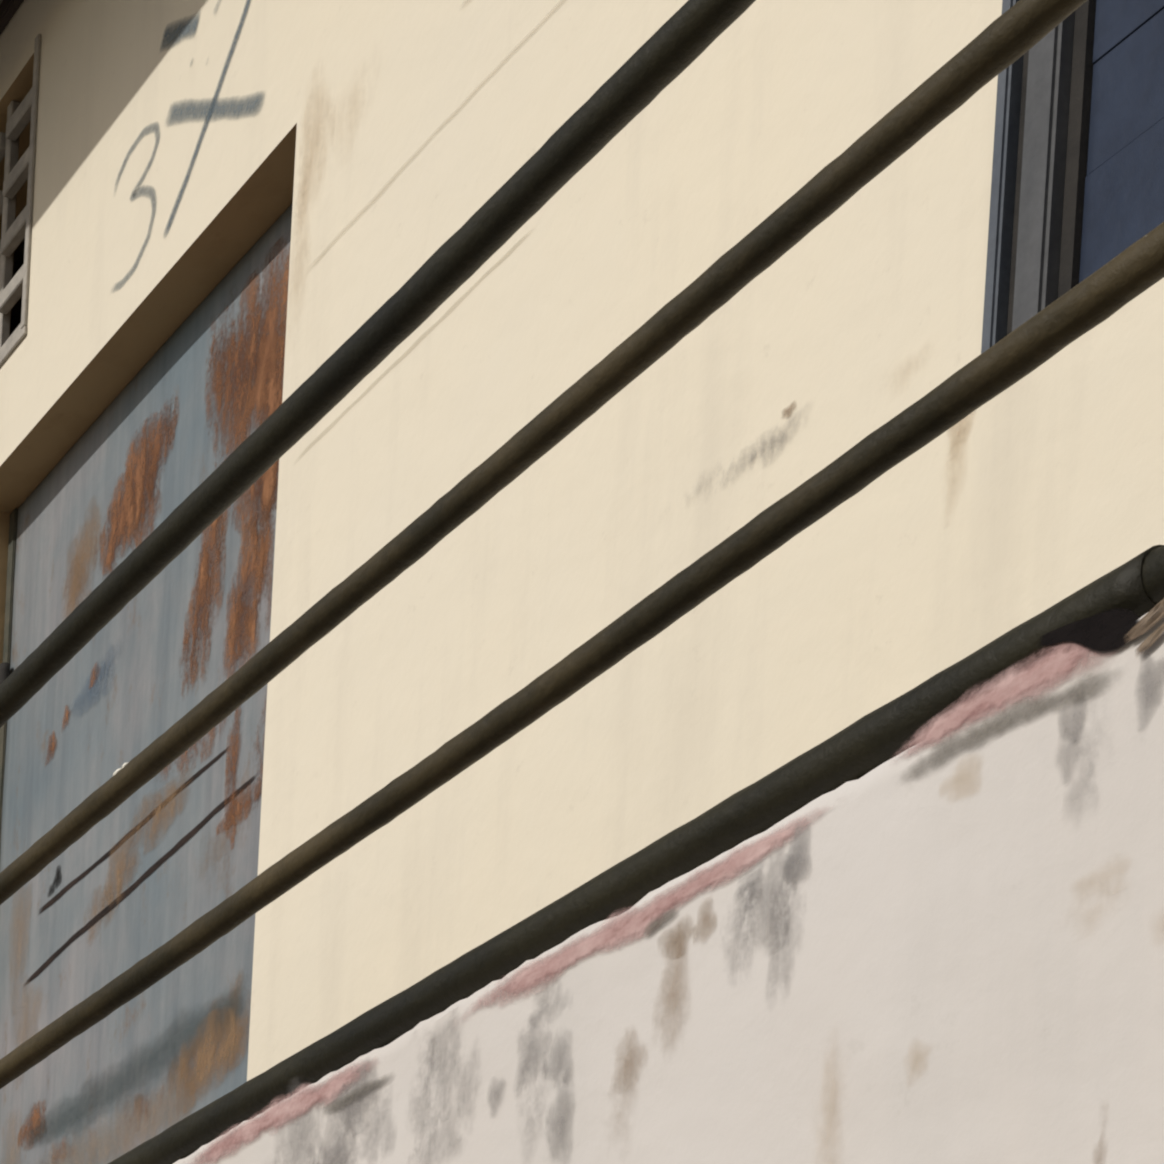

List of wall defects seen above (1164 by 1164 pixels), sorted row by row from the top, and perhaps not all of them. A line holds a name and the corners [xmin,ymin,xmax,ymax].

corrosion [206,252,289,453]
corrosion [100,417,172,570]
corrosion [184,459,279,682]
corrosion [47,708,69,760]
corrosion [216,711,263,843]
spalling [908,599,1164,773]
spalling [479,818,809,1005]
corrosion [17,1102,45,1145]
spalling [198,1066,384,1164]